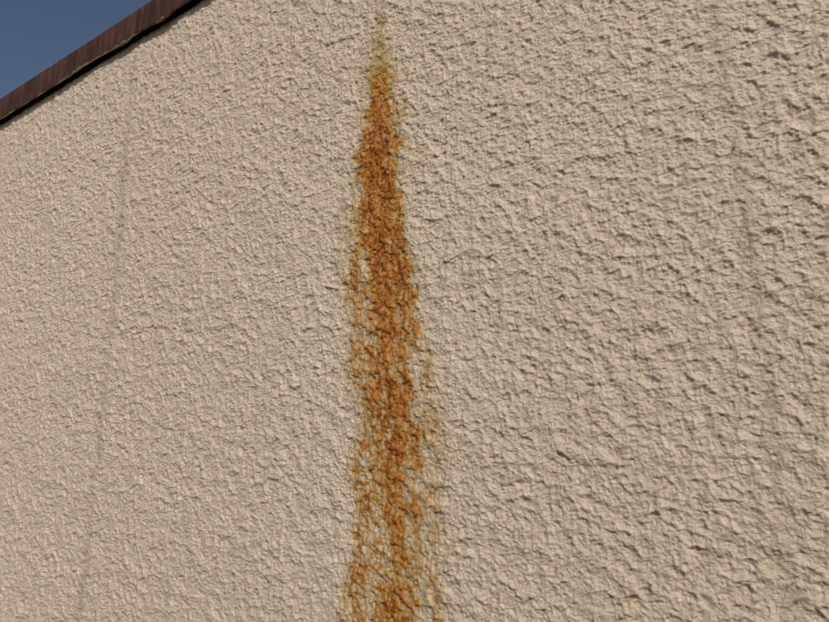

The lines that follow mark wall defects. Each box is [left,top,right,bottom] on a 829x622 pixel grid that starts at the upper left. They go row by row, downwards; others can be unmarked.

corrosion [339,14,444,622]